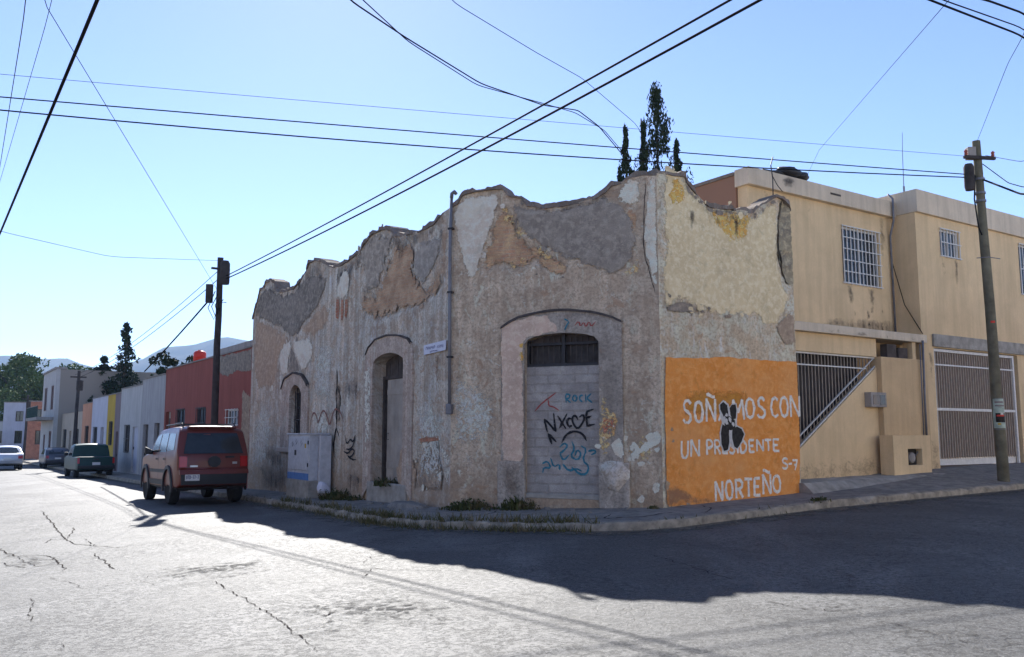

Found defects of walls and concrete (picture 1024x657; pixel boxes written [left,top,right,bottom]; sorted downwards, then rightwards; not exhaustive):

flaking render [361,243,441,320]
flaking render [454,194,566,278]
flaking render [618,166,796,345]
flaking render [220,318,312,452]
spalling [396,435,450,492]